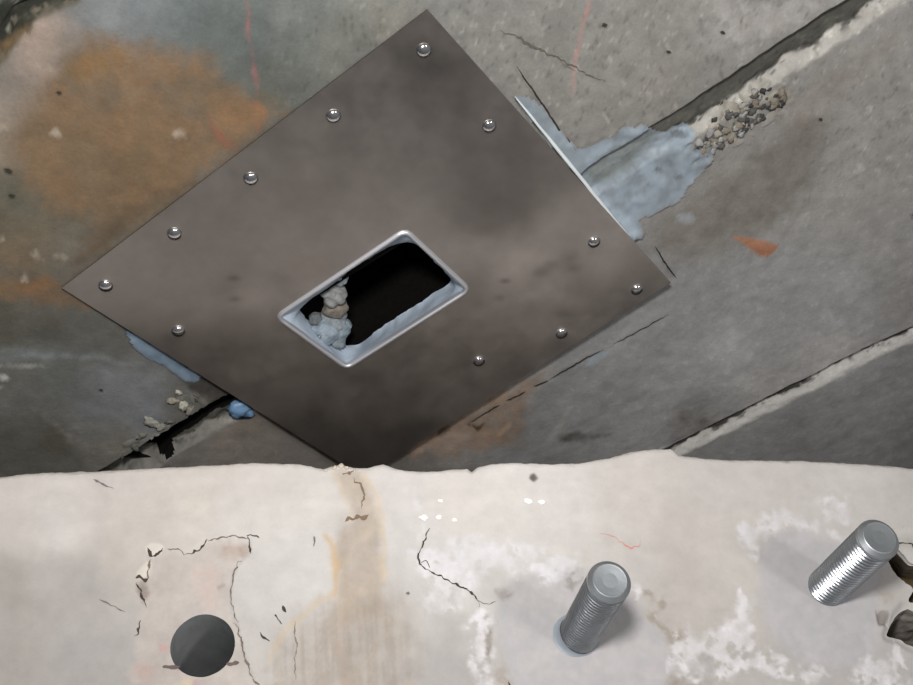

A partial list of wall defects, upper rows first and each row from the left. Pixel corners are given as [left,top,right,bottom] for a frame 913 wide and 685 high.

spalling [693,77,795,164]
corrosion [0,18,295,316]
spalling [122,533,260,685]
crack [417,528,496,606]
hole [888,554,913,612]